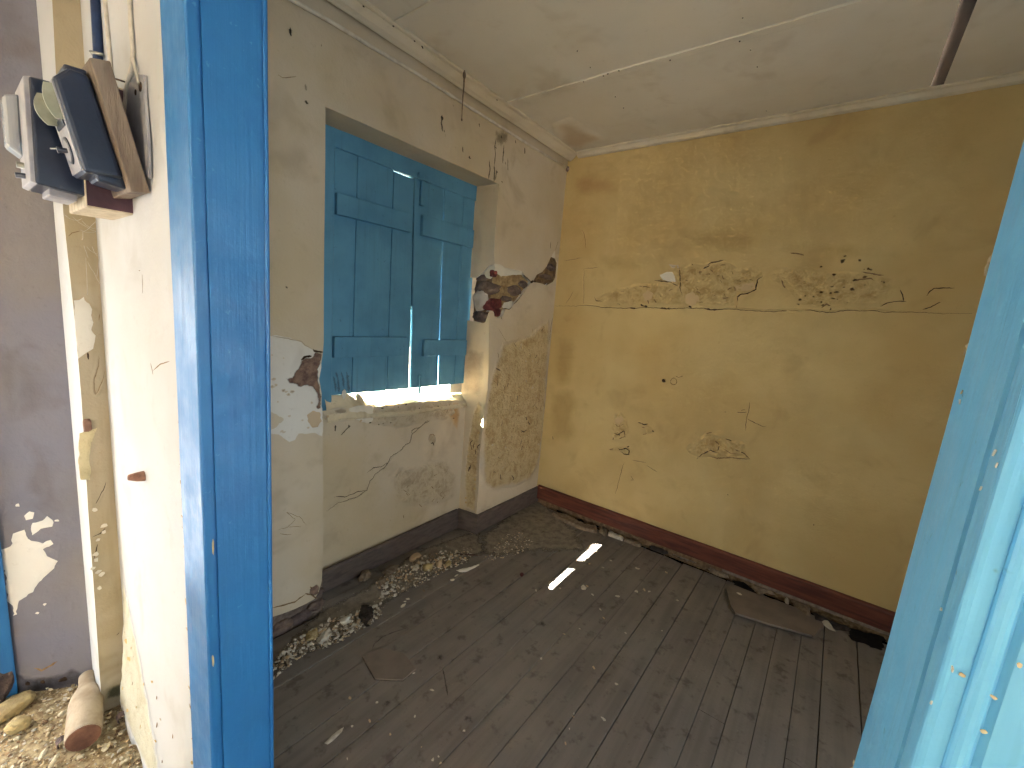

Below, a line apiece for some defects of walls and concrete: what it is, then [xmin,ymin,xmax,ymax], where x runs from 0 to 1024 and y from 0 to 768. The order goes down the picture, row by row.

peeling [74,297,96,360]
flaking render [472,243,558,323]
flaking render [594,260,763,310]
crack [548,287,972,354]
peeling [270,335,459,442]
crack [326,416,435,513]
peeling [1,504,59,616]